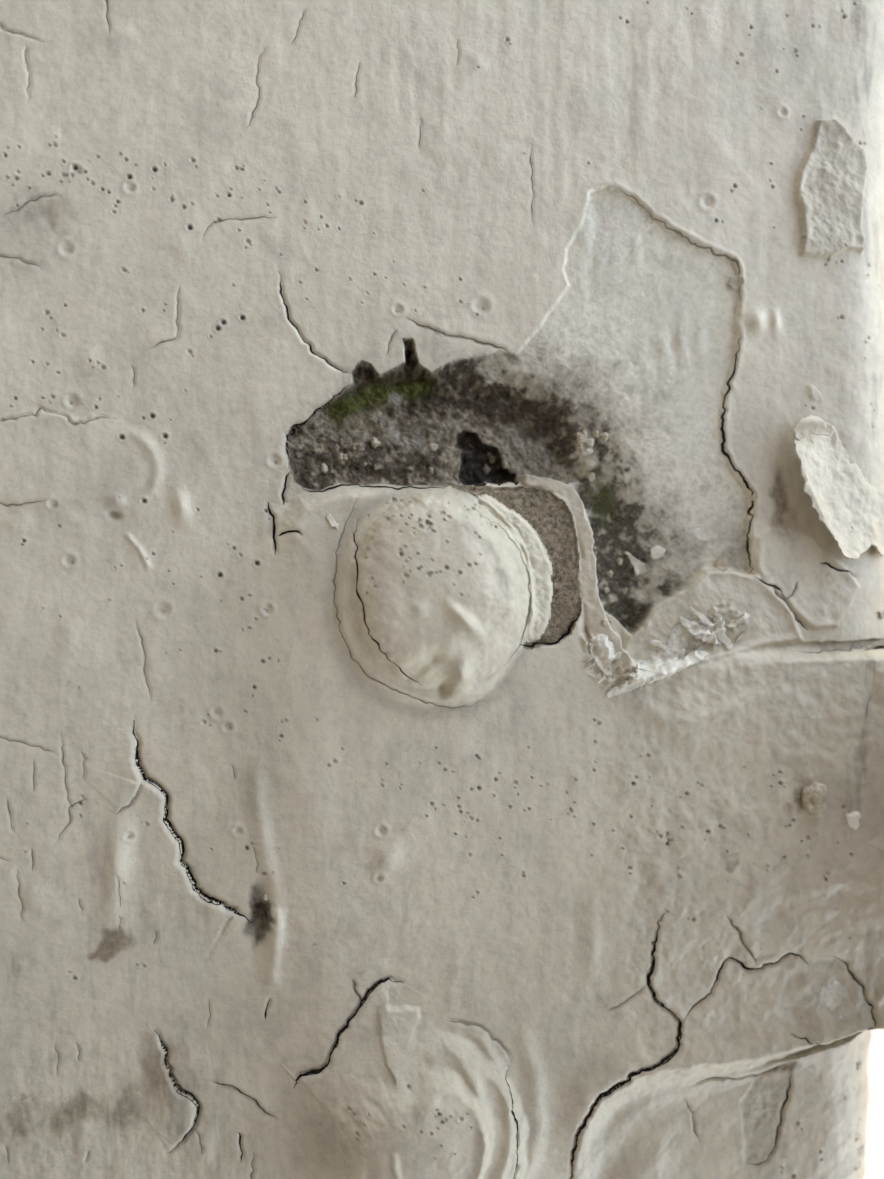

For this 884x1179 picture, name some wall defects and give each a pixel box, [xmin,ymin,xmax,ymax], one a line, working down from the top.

damp [579,203,650,287]
crack [620,189,741,301]
peeling [794,119,867,260]
damp [289,427,447,489]
damp [334,335,670,631]
peeling [287,184,884,666]
crack [0,737,85,919]
crack [117,721,253,923]
crack [154,1030,272,1154]
crack [294,977,403,1087]
crack [570,913,806,1179]
crack [834,956,876,1033]